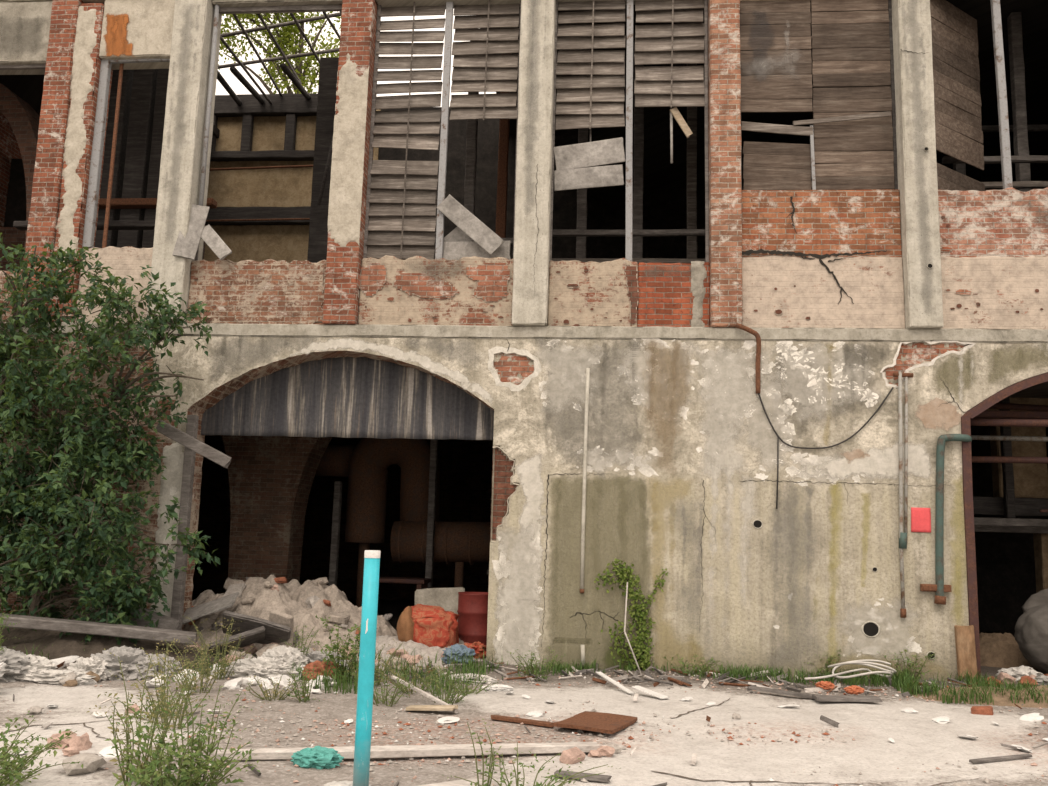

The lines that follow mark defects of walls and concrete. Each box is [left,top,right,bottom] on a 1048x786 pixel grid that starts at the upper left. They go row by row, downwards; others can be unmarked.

rust [104,14,133,56]
peeling [56,6,97,272]
spalling [359,262,459,308]
spalling [466,262,510,318]
crack [742,197,887,304]
peeling [290,338,600,411]
peeling [590,261,980,486]
peeling [491,446,546,666]
damp [547,478,650,669]